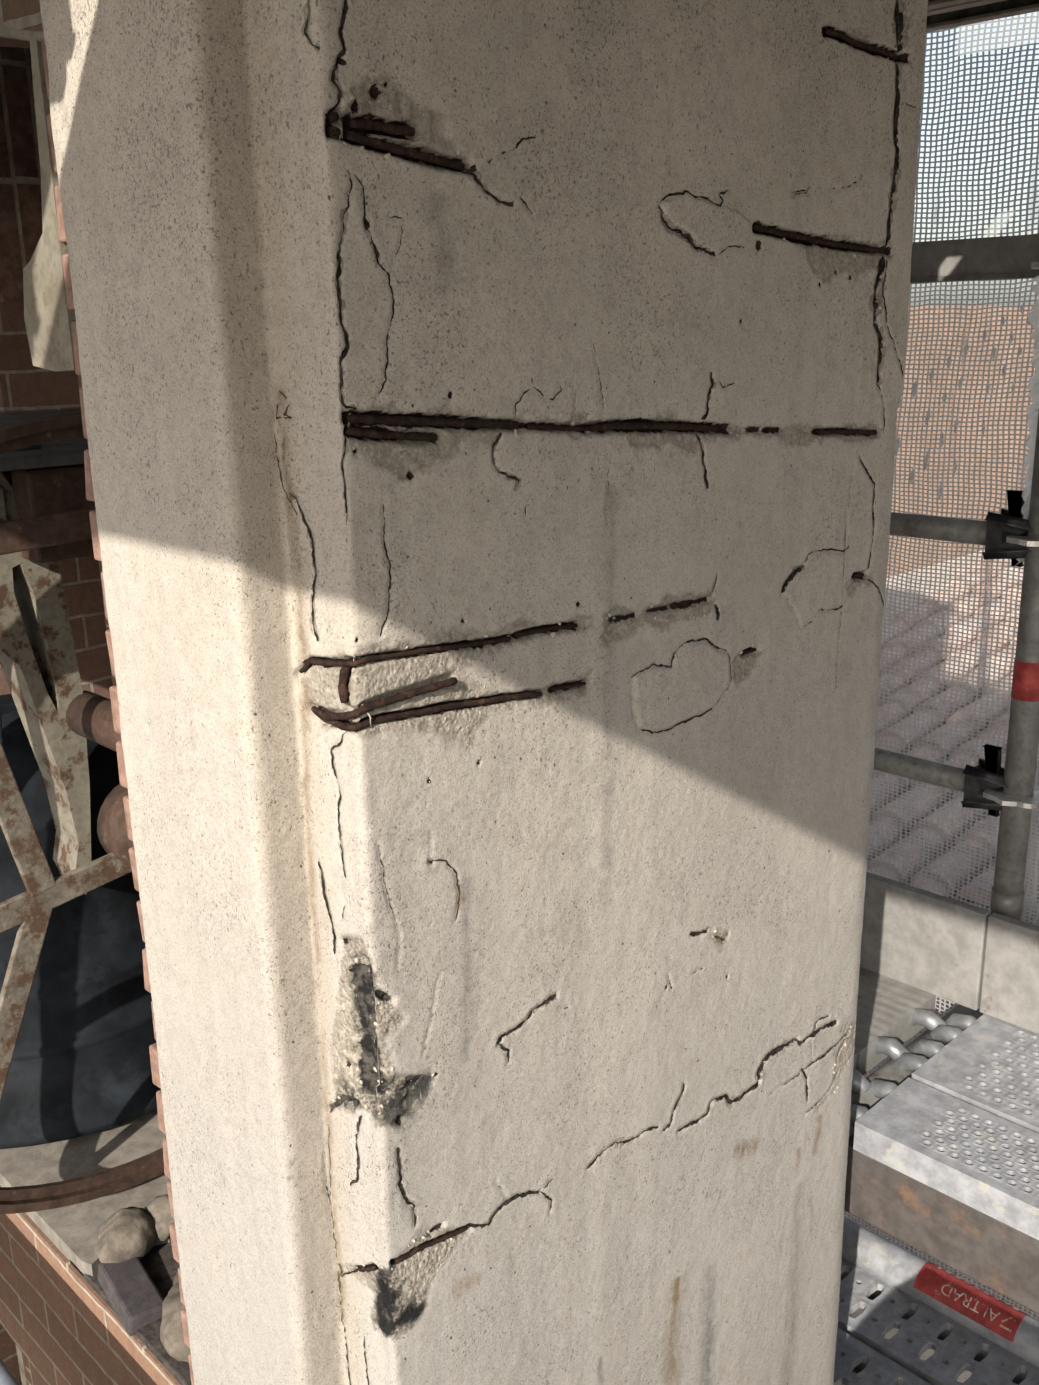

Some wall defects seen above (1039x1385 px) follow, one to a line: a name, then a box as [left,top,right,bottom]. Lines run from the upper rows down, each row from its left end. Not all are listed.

crack [302,0,349,116]
crack [792,0,916,429]
crack [274,171,404,641]
crack [318,732,346,954]
crack [428,837,460,921]
spalling [330,935,438,1127]
crack [497,992,568,1062]
crack [587,1016,847,1169]
crack [324,1116,369,1385]
crack [396,1147,419,1227]
spalling [350,1223,468,1340]
crack [465,1179,553,1228]